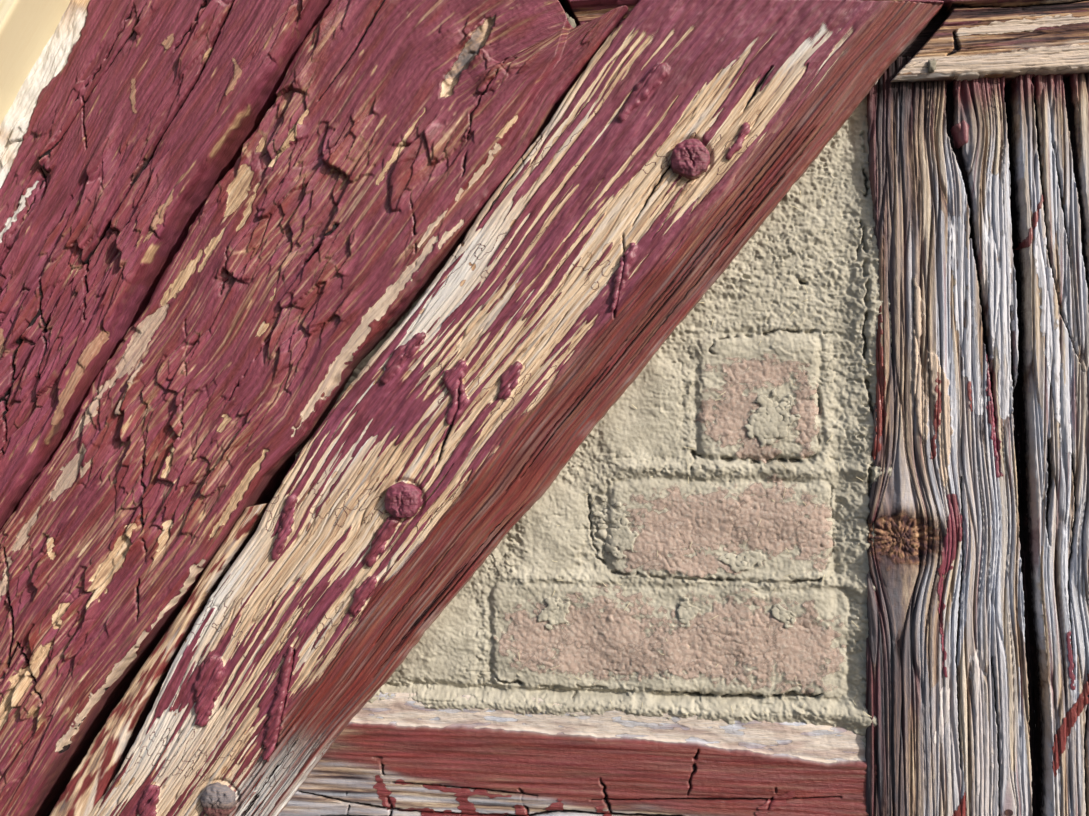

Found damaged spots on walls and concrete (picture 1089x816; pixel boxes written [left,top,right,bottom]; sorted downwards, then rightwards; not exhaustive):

crack [899,0,1088,58]
crack [0,273,50,439]
peeling [0,164,260,602]
peeling [85,16,853,816]
crack [377,117,834,673]
peeling [913,278,953,489]
crack [945,76,1089,816]
crack [1,595,43,703]
peeling [52,603,70,629]
peeling [55,559,206,752]
crack [241,740,298,816]
crack [301,750,840,816]